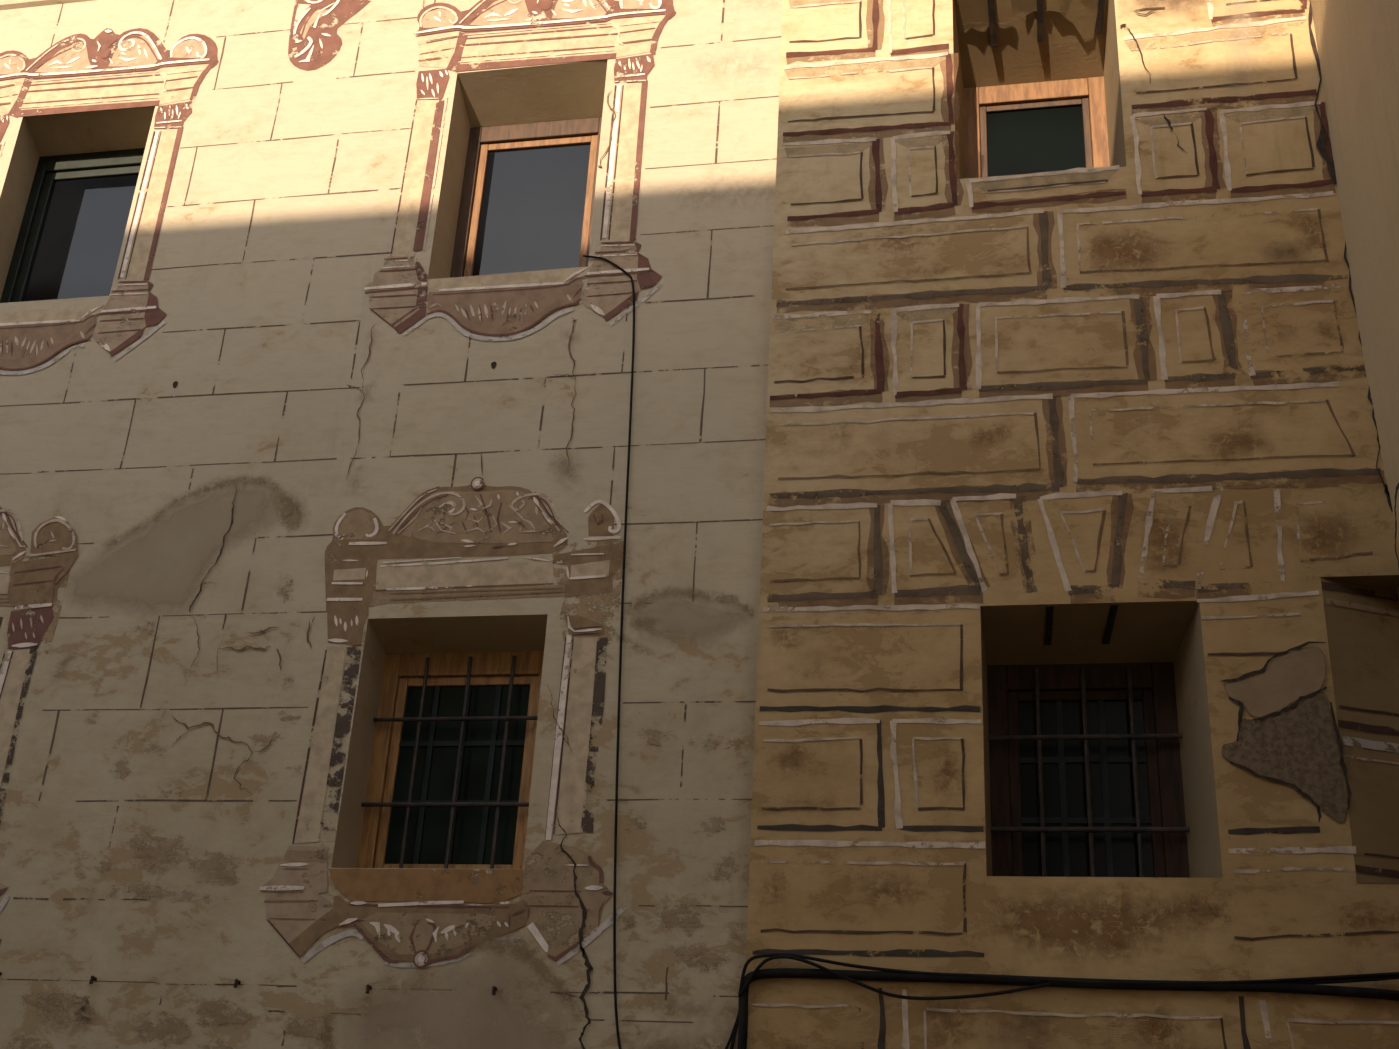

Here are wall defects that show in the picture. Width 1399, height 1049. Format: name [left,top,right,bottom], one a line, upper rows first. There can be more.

crack [189,485,315,679]
crack [171,714,280,794]
spalling [1221,641,1351,823]
crack [553,813,600,1049]